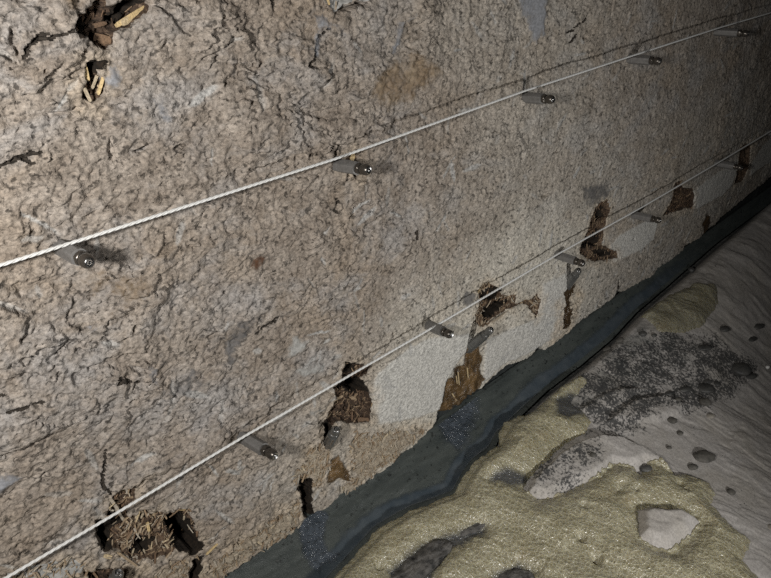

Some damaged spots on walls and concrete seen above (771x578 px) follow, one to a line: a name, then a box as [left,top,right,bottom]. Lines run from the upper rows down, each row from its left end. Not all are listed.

crack [21,28,75,60]
spalling [75,0,149,49]
crack [308,28,331,69]
spalling [82,59,107,102]
crack [0,150,43,169]
spalling [579,199,618,264]
spalling [475,282,541,327]
crack [117,376,140,386]
crack [0,393,45,415]
spalling [322,362,373,446]
crack [100,449,112,495]
spalling [7,487,218,578]